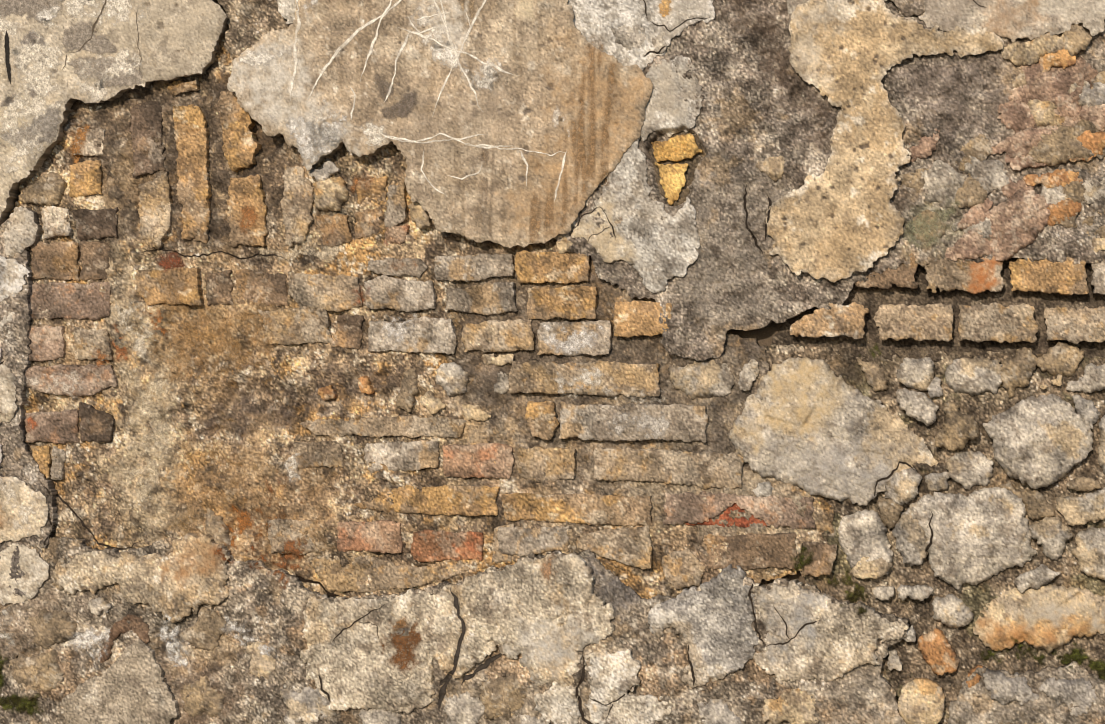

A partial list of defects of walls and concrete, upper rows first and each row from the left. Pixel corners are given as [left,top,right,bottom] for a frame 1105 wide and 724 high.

spalling [0,0,837,599]
rust [659,0,671,17]
spalling [555,0,1105,361]
crack [438,588,502,714]
spalling [728,253,1105,724]